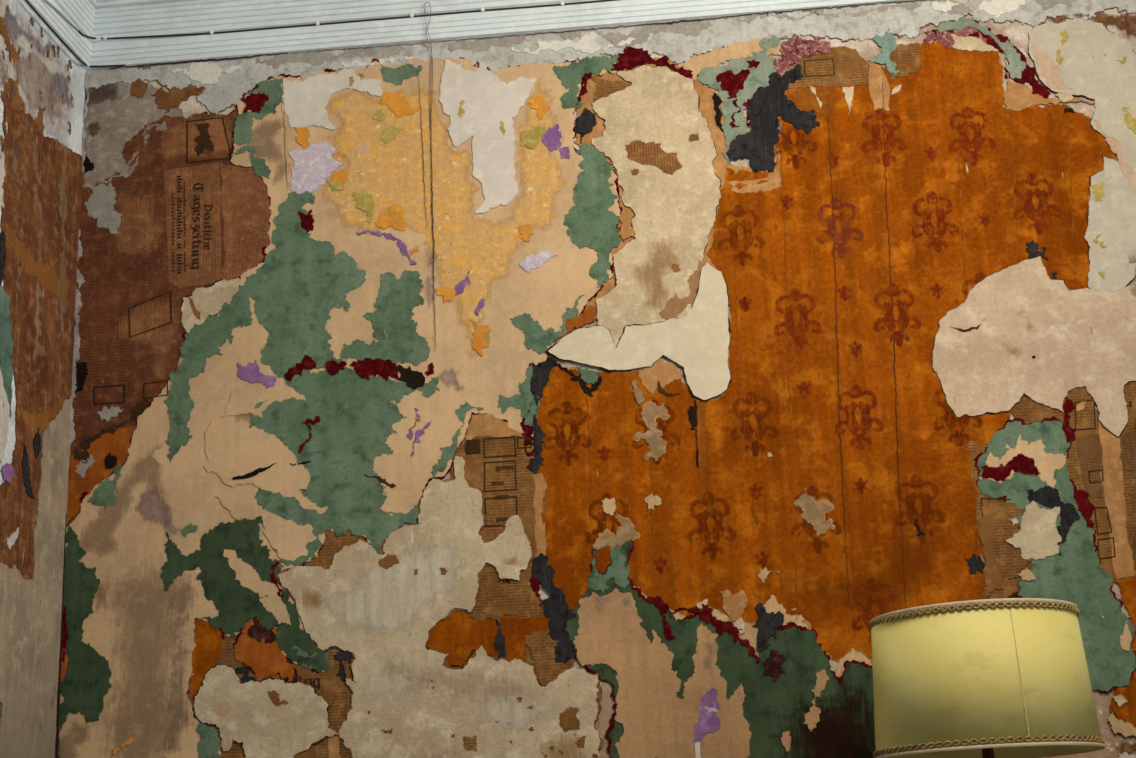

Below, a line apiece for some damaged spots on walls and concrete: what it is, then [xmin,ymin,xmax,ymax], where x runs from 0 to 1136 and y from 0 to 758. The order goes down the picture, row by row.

peeling [0,0,73,210]
peeling [84,0,1136,438]
peeling [520,357,553,474]
peeling [0,362,95,758]
flaking render [193,454,604,758]
peeling [1006,501,1062,581]
peeling [1120,619,1132,651]